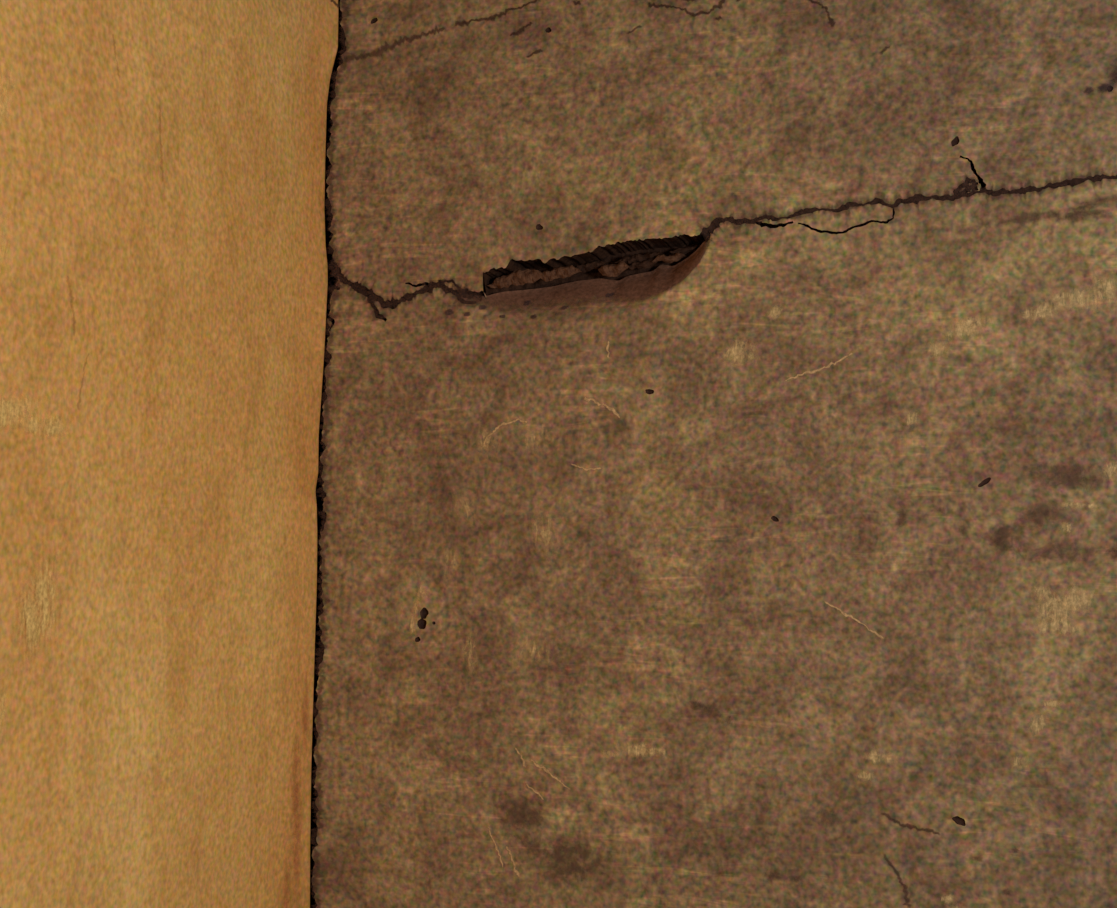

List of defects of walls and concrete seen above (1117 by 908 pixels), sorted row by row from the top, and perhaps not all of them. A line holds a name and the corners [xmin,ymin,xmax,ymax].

crack [629,0,740,33]
crack [810,0,835,27]
crack [700,155,1117,240]
spalling [445,234,708,319]
crack [310,0,541,908]